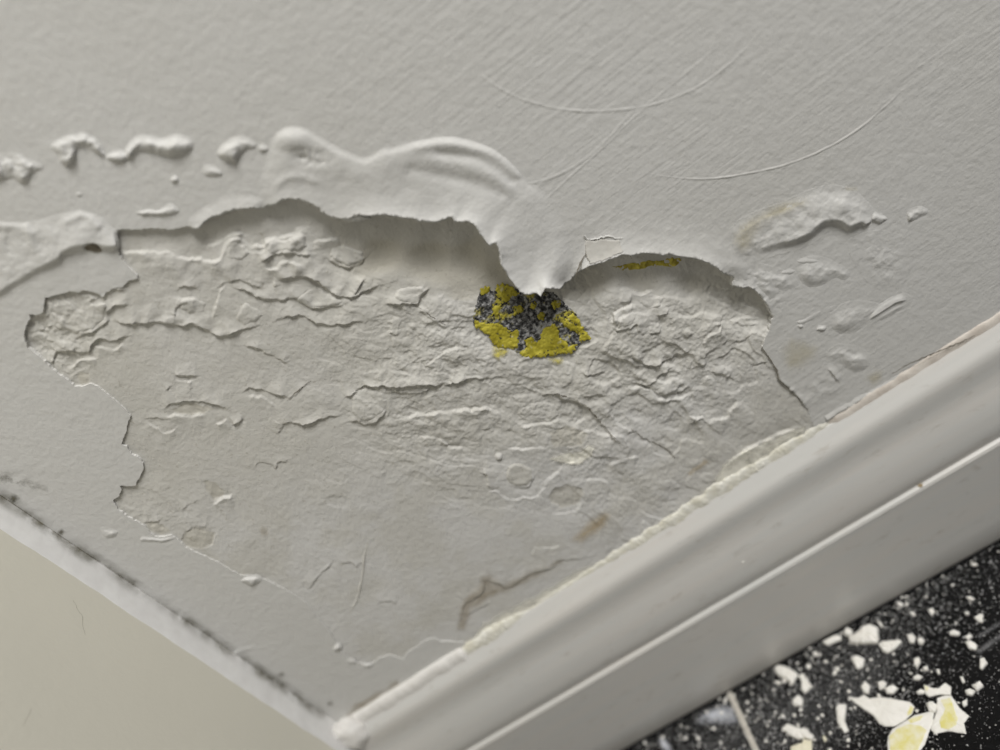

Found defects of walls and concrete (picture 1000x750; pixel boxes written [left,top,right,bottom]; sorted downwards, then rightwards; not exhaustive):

flaking render [0,126,1000,670]